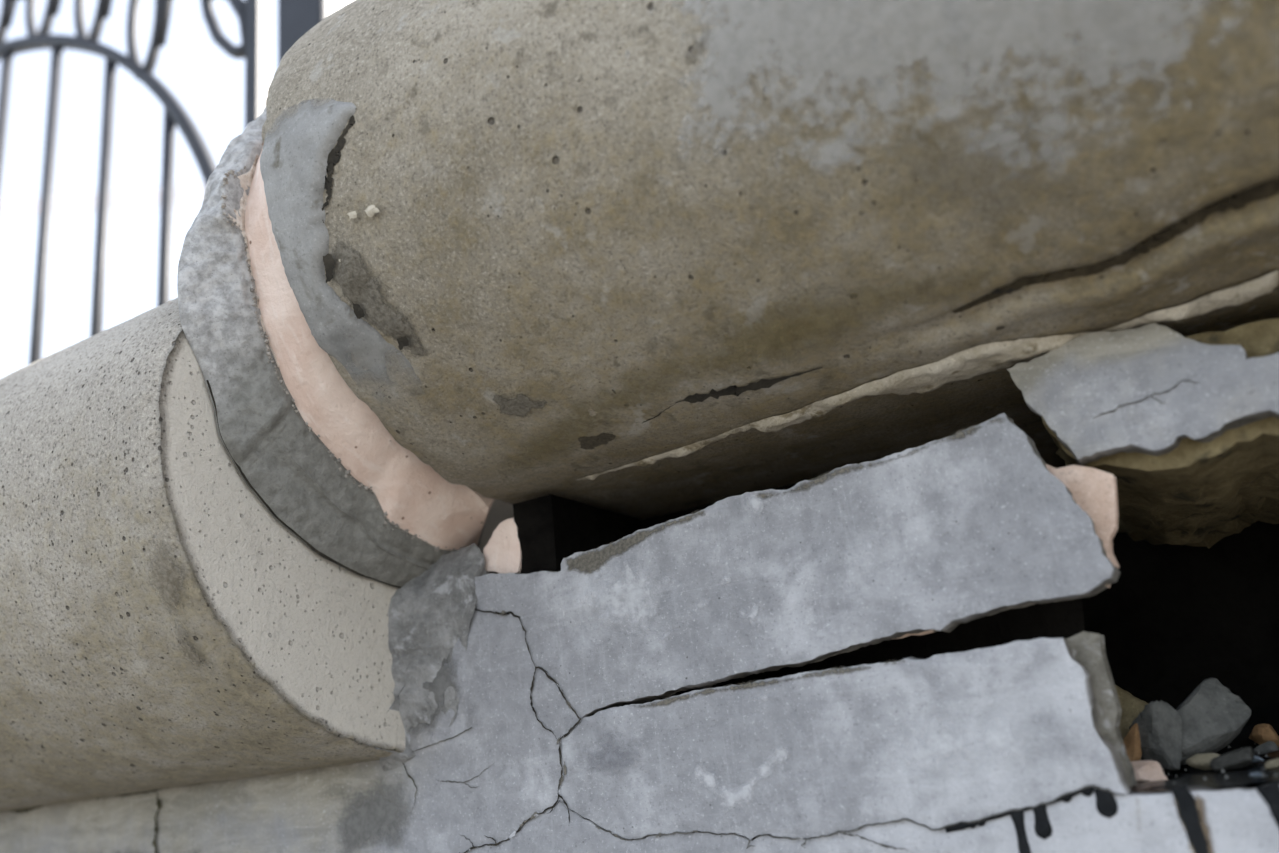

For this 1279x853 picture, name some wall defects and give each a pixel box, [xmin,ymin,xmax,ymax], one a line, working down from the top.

damp [686,0,1199,164]
crack [952,180,1279,313]
spalling [220,166,462,552]
spalling [494,394,547,417]
crack [642,367,823,423]
crack [1095,375,1199,418]
spalling [475,413,1168,840]
crack [403,727,495,807]
crack [459,598,1127,853]
spalling [1249,724,1279,747]
crack [8,805,47,813]
crack [96,783,202,853]